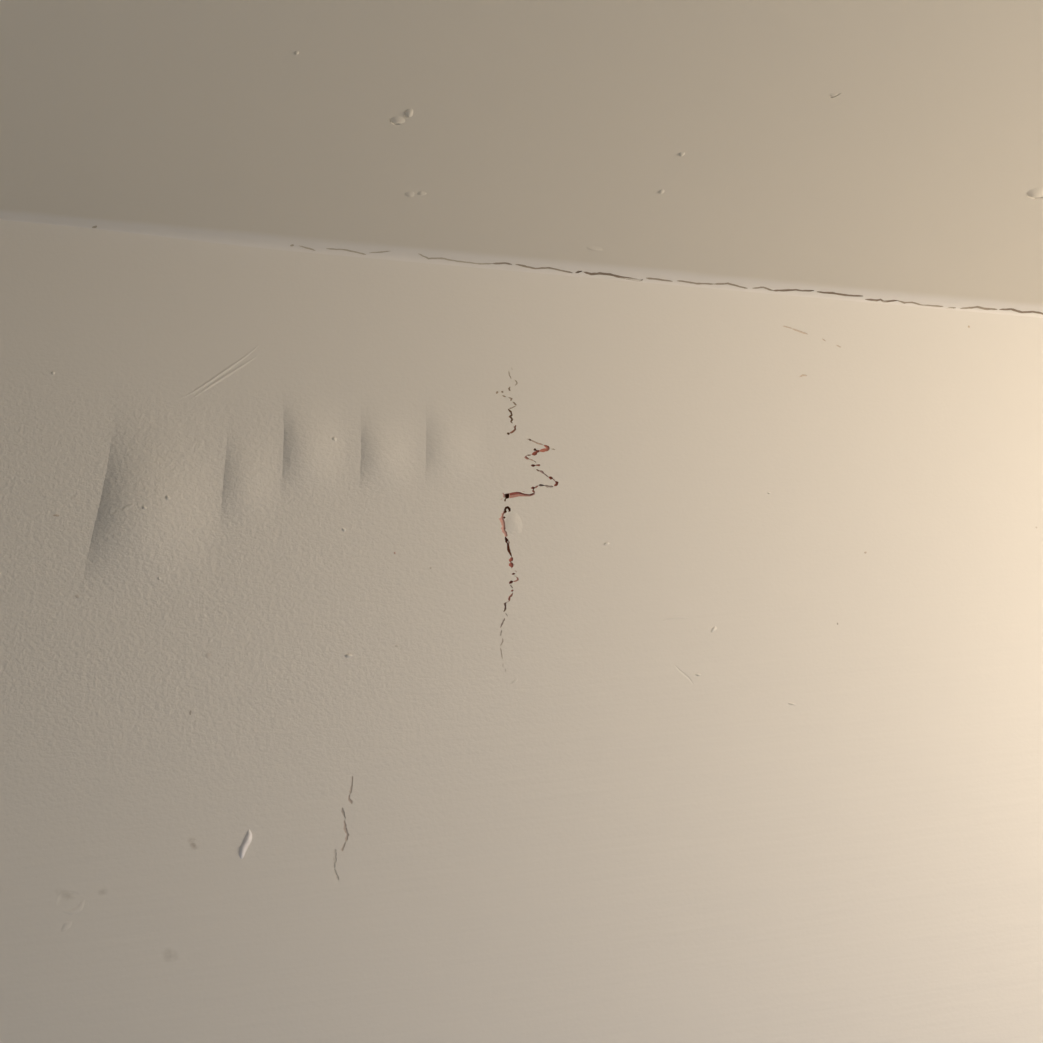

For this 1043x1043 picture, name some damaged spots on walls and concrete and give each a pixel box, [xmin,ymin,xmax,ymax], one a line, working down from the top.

crack [290,244,389,255]
crack [418,253,1043,315]
crack [496,373,558,672]